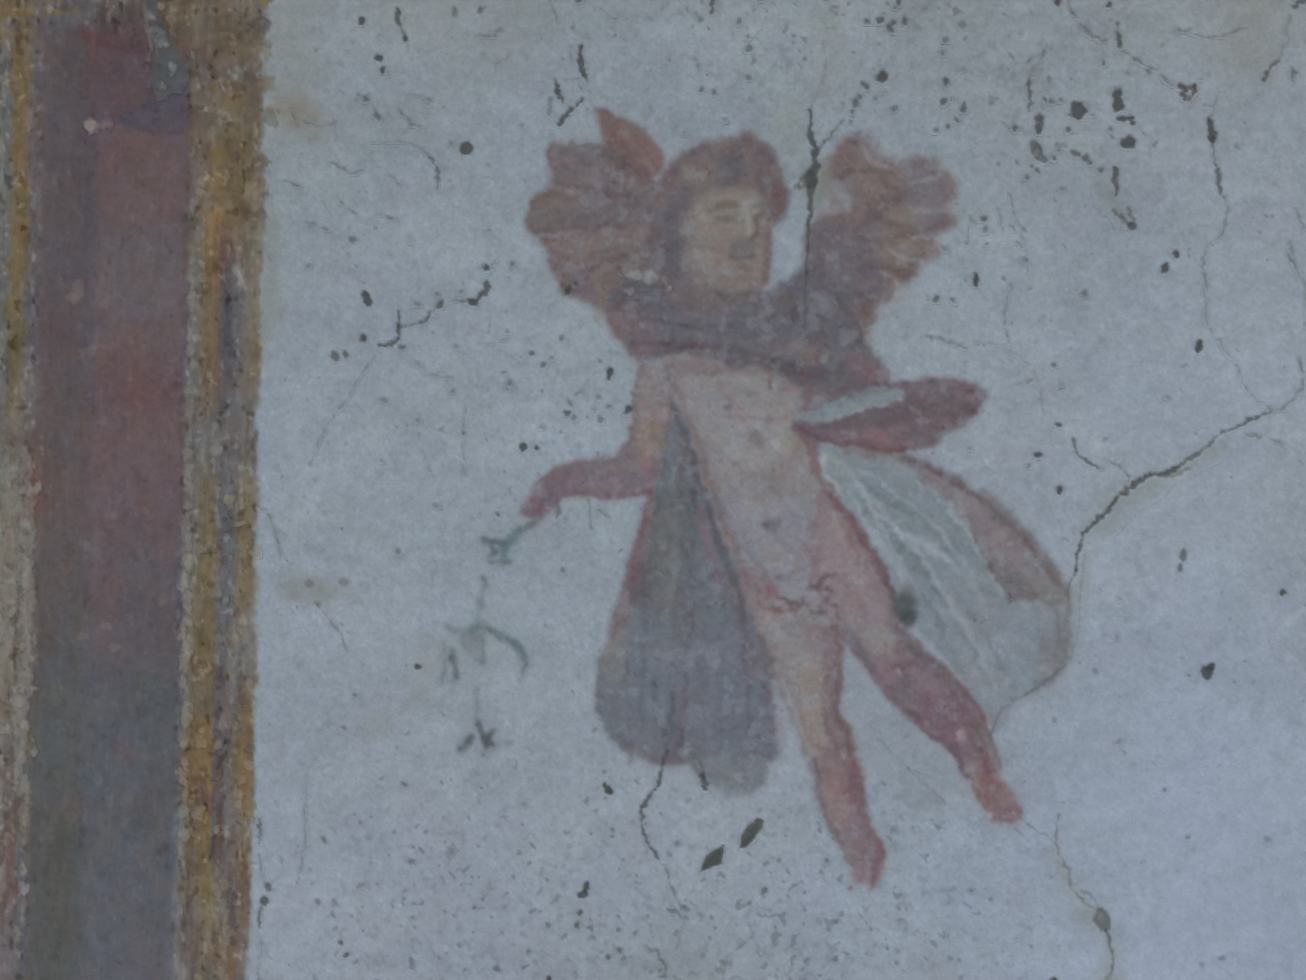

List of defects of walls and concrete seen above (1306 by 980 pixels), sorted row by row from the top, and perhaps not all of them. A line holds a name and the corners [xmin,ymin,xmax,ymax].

crack [792,38,845,331]
spalling [1066,100,1091,121]
spalling [1069,149,1106,175]
spalling [1110,85,1139,151]
crack [307,256,500,480]
crack [918,0,1306,743]
crack [637,749,711,980]
spalling [698,816,764,875]
crack [1017,812,1133,980]